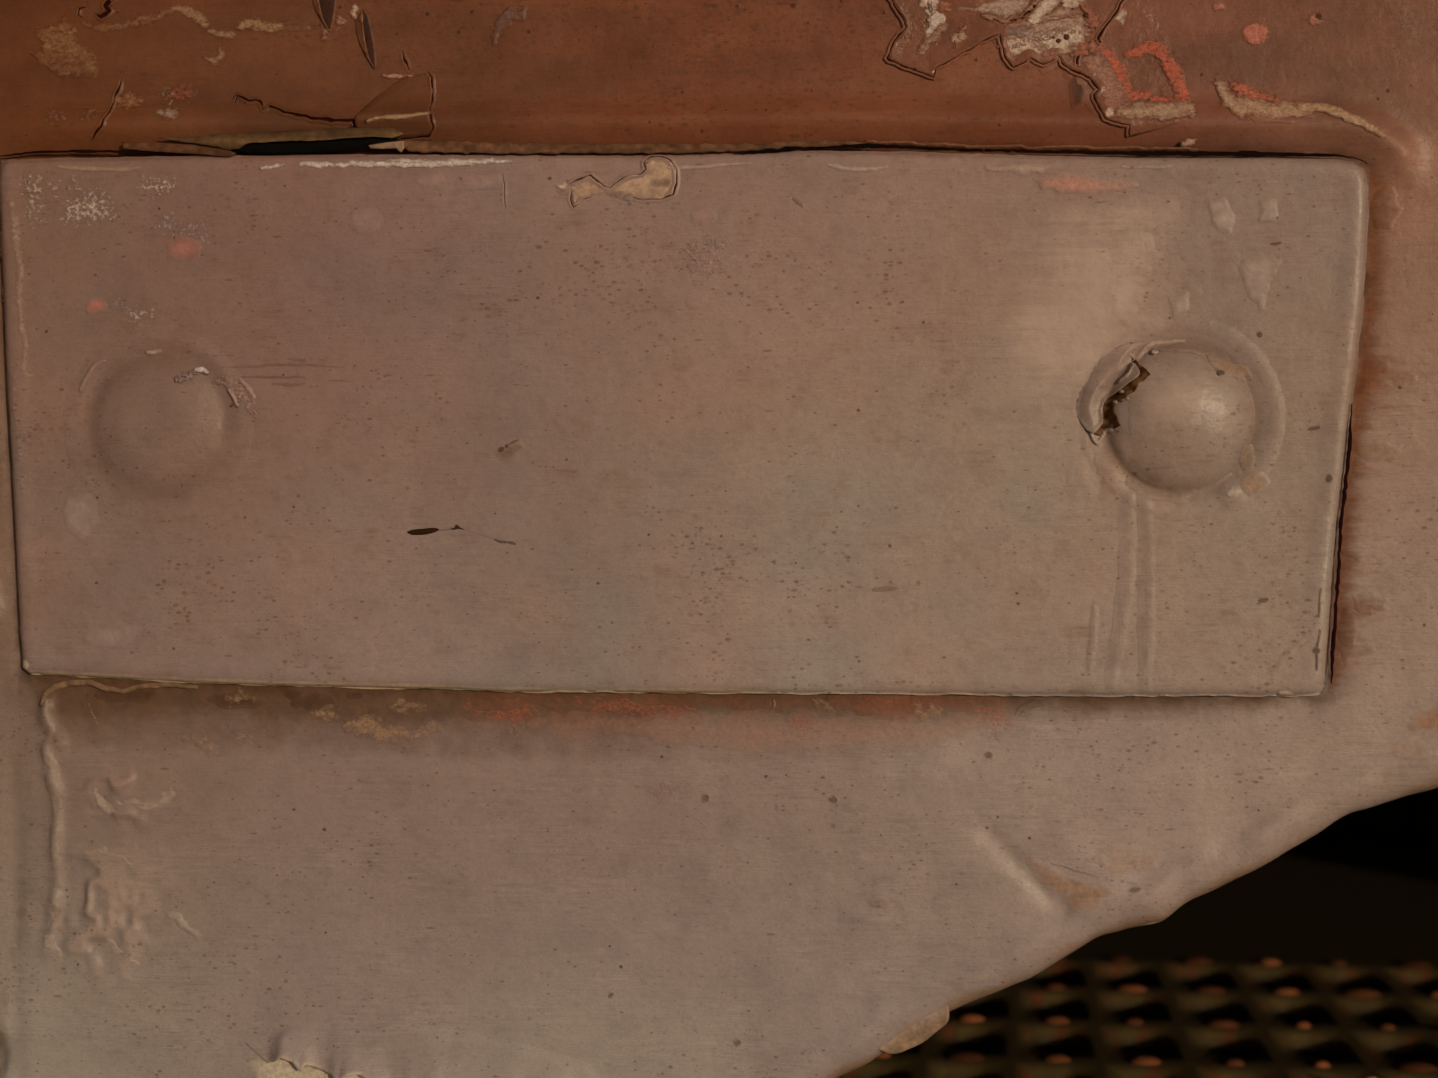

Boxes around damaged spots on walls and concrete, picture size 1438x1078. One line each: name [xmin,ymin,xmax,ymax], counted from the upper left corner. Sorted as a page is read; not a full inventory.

crack [74,0,118,22]
crack [312,0,412,73]
peeling [884,0,1198,137]
peeling [1241,22,1269,46]
crack [0,76,172,157]
crack [232,92,356,128]
crack [733,138,1368,164]
peeling [1211,77,1387,139]
peeling [7,69,889,496]
peeling [1238,252,1283,312]
peeling [944,162,1237,499]
rust [447,692,1036,762]